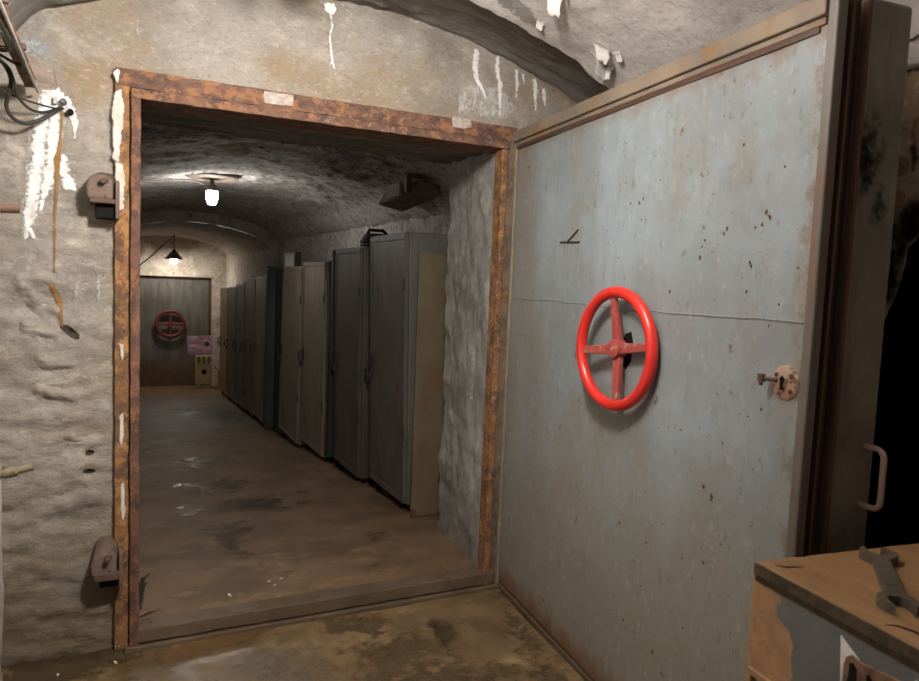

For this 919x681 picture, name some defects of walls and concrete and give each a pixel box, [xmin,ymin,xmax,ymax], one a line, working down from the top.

leakage [324,3,337,74]
leakage [458,48,547,120]
peeling [590,42,623,83]
leakage [21,87,79,241]
corrosion [49,110,63,328]